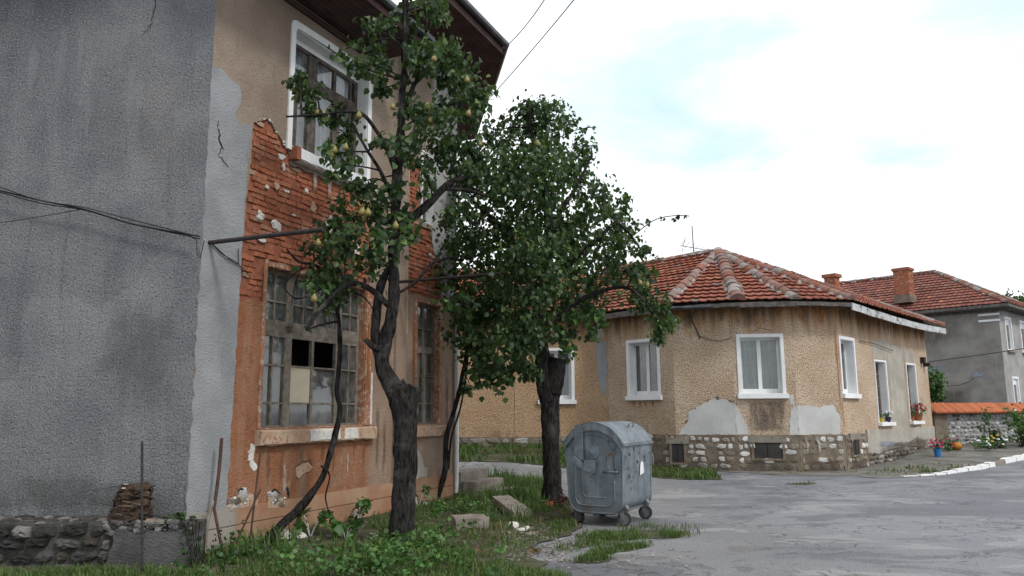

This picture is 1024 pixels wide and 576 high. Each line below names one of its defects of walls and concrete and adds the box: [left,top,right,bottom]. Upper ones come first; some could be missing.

flaking render [239,118,370,303]
flaking render [408,162,441,300]
spalling [248,443,258,471]
spalling [296,460,312,479]
spalling [226,487,286,512]